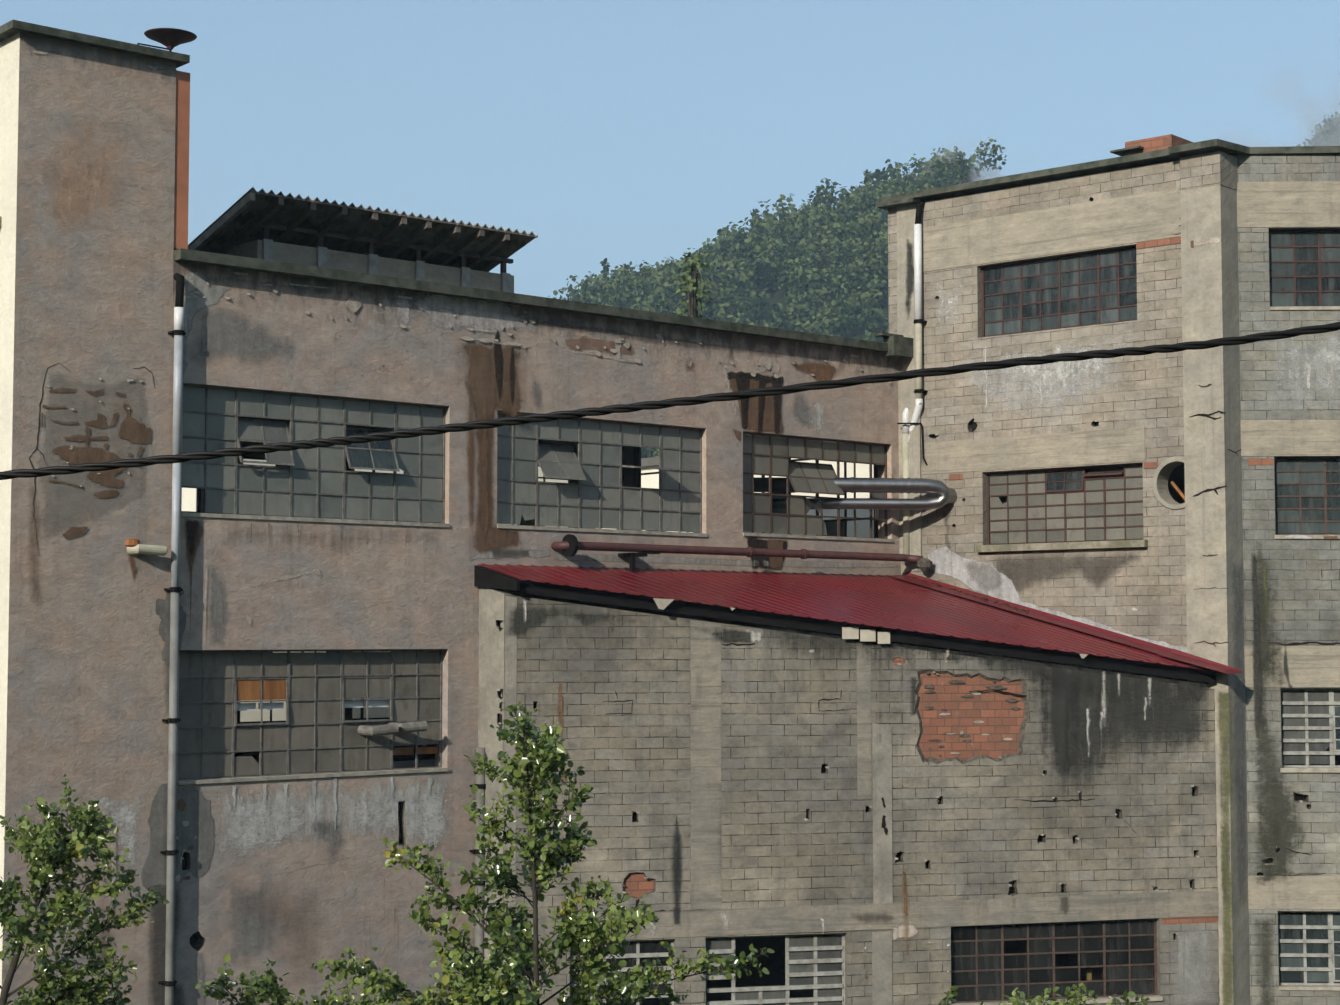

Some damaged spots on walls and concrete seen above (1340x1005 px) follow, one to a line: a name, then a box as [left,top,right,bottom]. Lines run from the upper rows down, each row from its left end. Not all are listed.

peeling [567,336,642,364]
flaking render [41,378,151,498]
crack [1190,411,1240,497]
flaking render [62,526,87,539]
spalling [892,657,1030,764]
water stain [1044,672,1120,768]
water stain [1234,551,1296,898]
spalling [622,872,656,899]